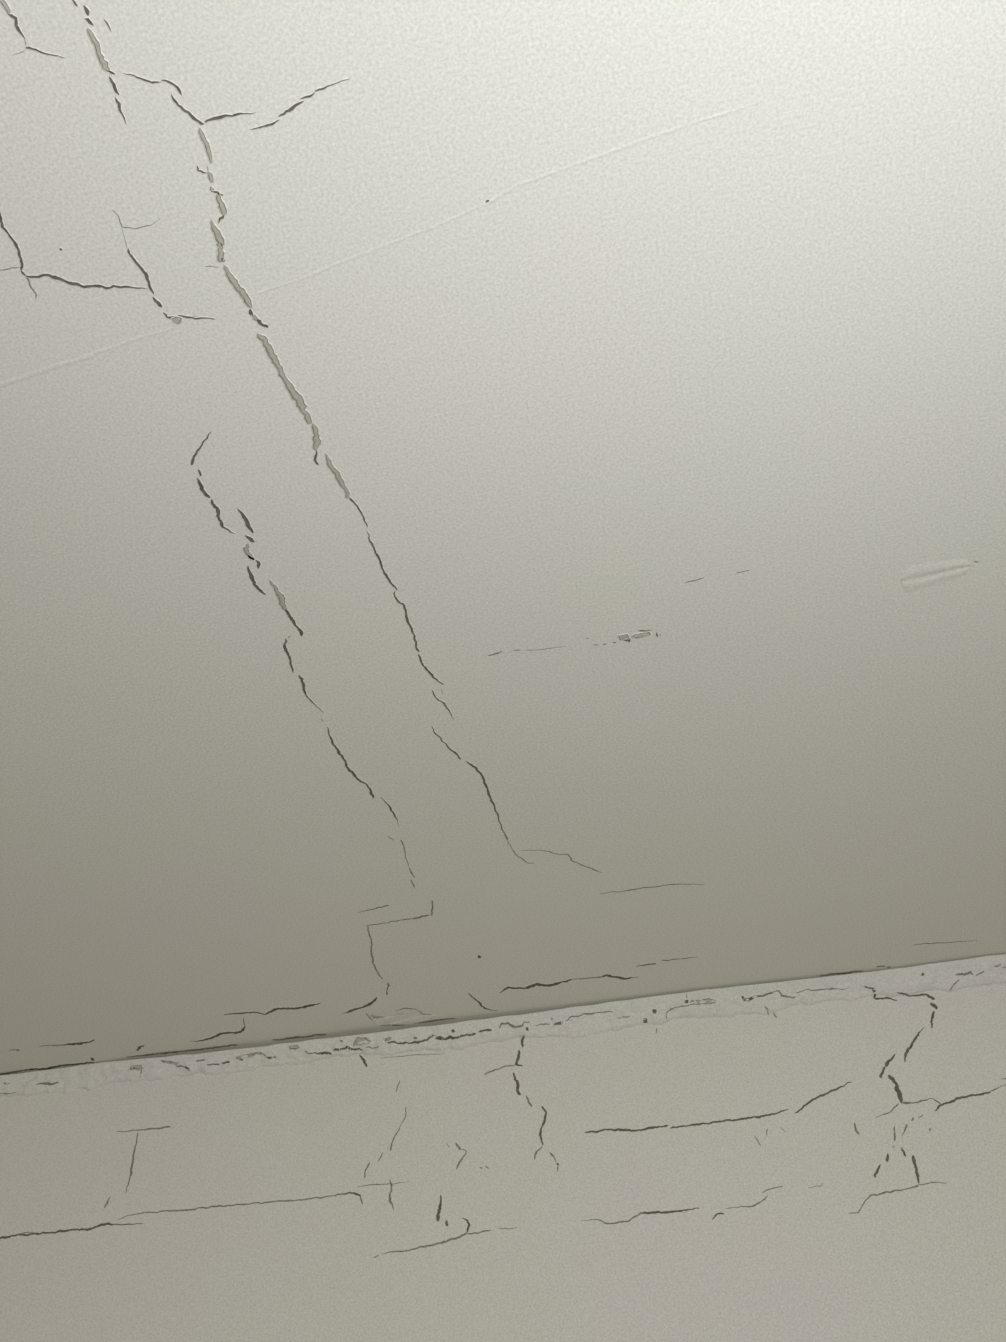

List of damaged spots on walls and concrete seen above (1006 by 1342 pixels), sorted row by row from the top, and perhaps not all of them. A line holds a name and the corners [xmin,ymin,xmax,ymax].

crack [0,0,702,894]
crack [373,1143,517,1258]
crack [0,431,1006,1240]